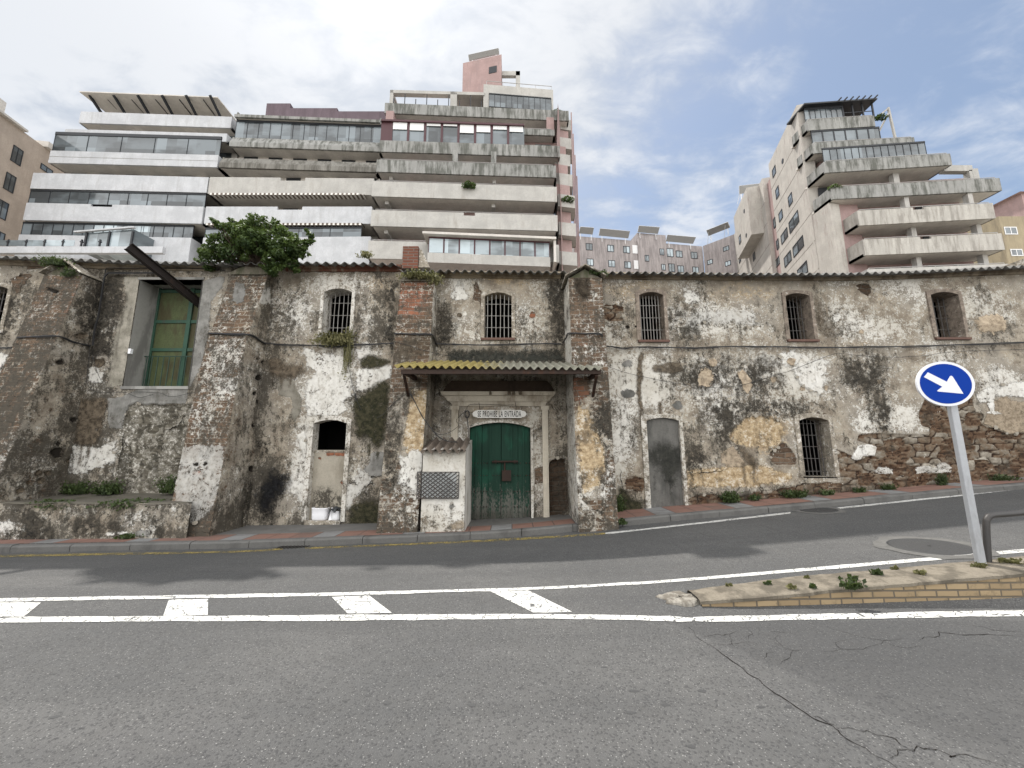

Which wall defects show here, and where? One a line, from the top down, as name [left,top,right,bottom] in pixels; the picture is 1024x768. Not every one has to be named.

spalling [11,267,46,294]
peeling [88,358,105,383]
damp [845,354,882,388]
damp [873,401,891,438]
peeling [976,381,1024,435]
peeling [534,376,606,515]
peeling [687,413,846,505]